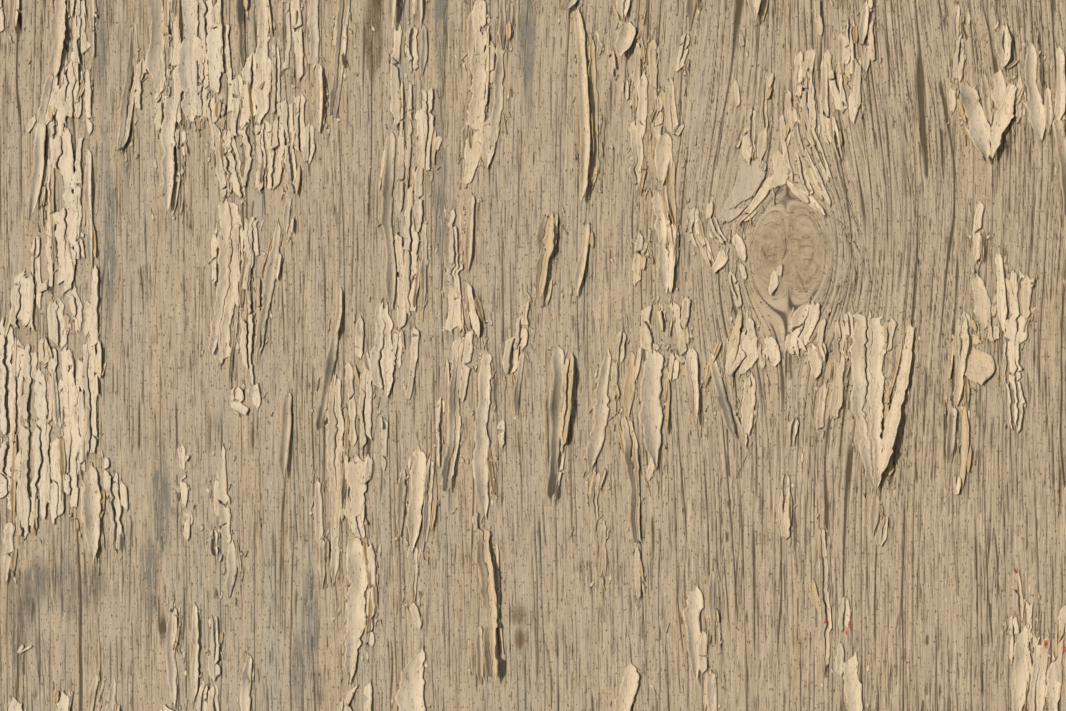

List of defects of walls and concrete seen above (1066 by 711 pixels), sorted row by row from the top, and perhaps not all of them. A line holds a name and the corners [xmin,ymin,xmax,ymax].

peeling [0,0,128,585]
peeling [114,0,358,478]
peeling [302,0,594,711]
peeling [558,0,921,610]
peeling [937,196,1038,501]
peeling [947,1,1066,249]
peeling [159,589,255,711]
peeling [172,440,248,606]
peeling [609,660,656,711]
peeling [665,569,725,711]
peeling [812,513,876,711]
peeling [1000,569,1066,711]